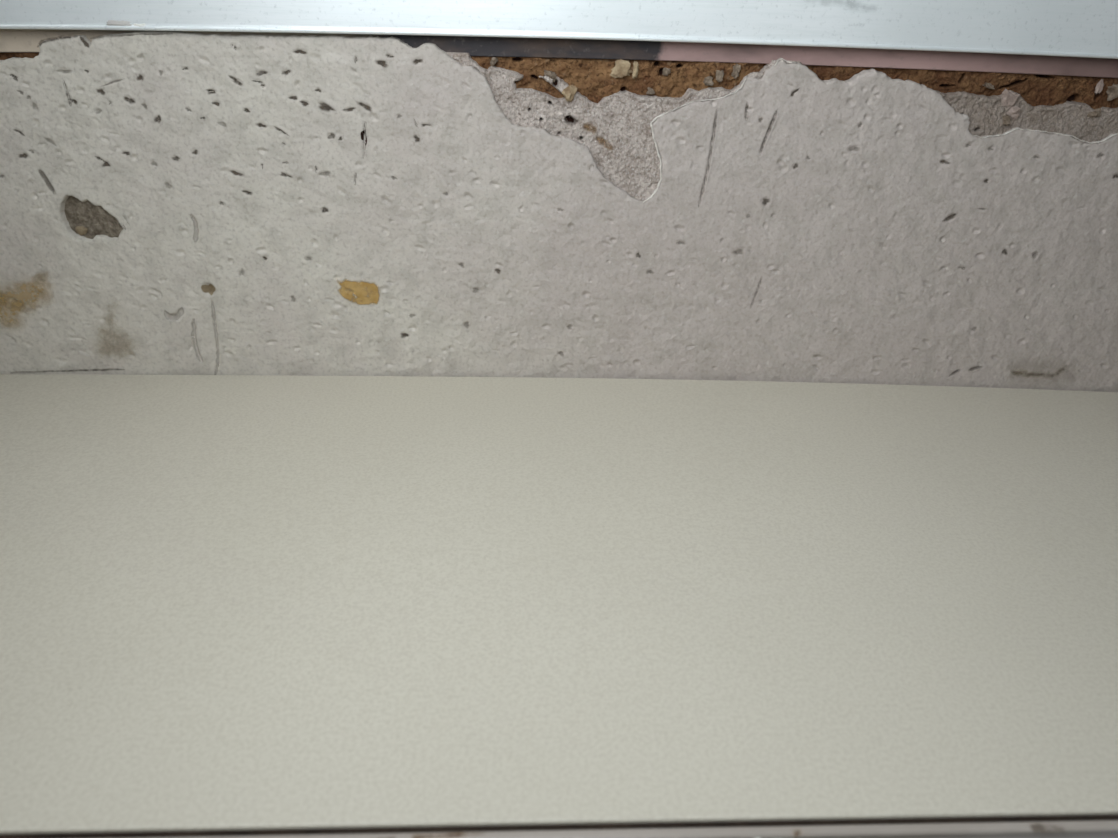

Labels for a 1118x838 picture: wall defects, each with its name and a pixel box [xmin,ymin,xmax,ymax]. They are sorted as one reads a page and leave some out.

spalling [445,52,1118,203]
spalling [65,196,123,239]